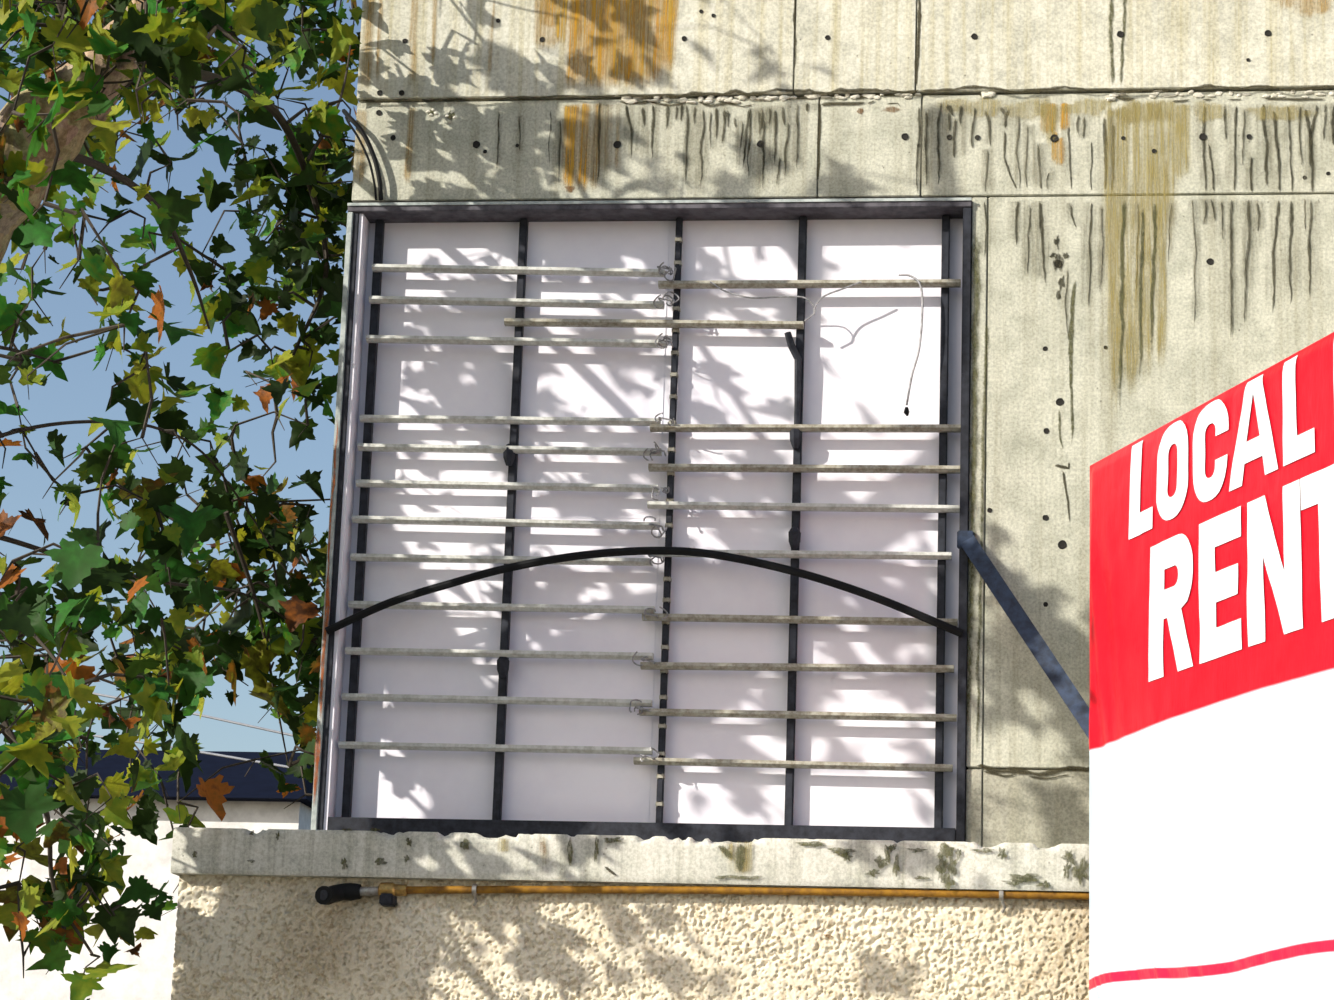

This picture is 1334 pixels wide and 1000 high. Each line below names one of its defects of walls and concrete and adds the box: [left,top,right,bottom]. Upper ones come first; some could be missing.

rust [365,0,383,81]
rust [536,0,678,81]
rust [564,104,606,192]
leakage [625,104,808,187]
rust [1045,103,1070,163]
leakage [916,99,1334,548]
leakage [594,837,622,861]
leakage [715,843,759,880]
leakage [798,841,855,861]
leakage [866,842,1007,890]
leakage [1003,873,1050,888]
leakage [1061,851,1089,885]